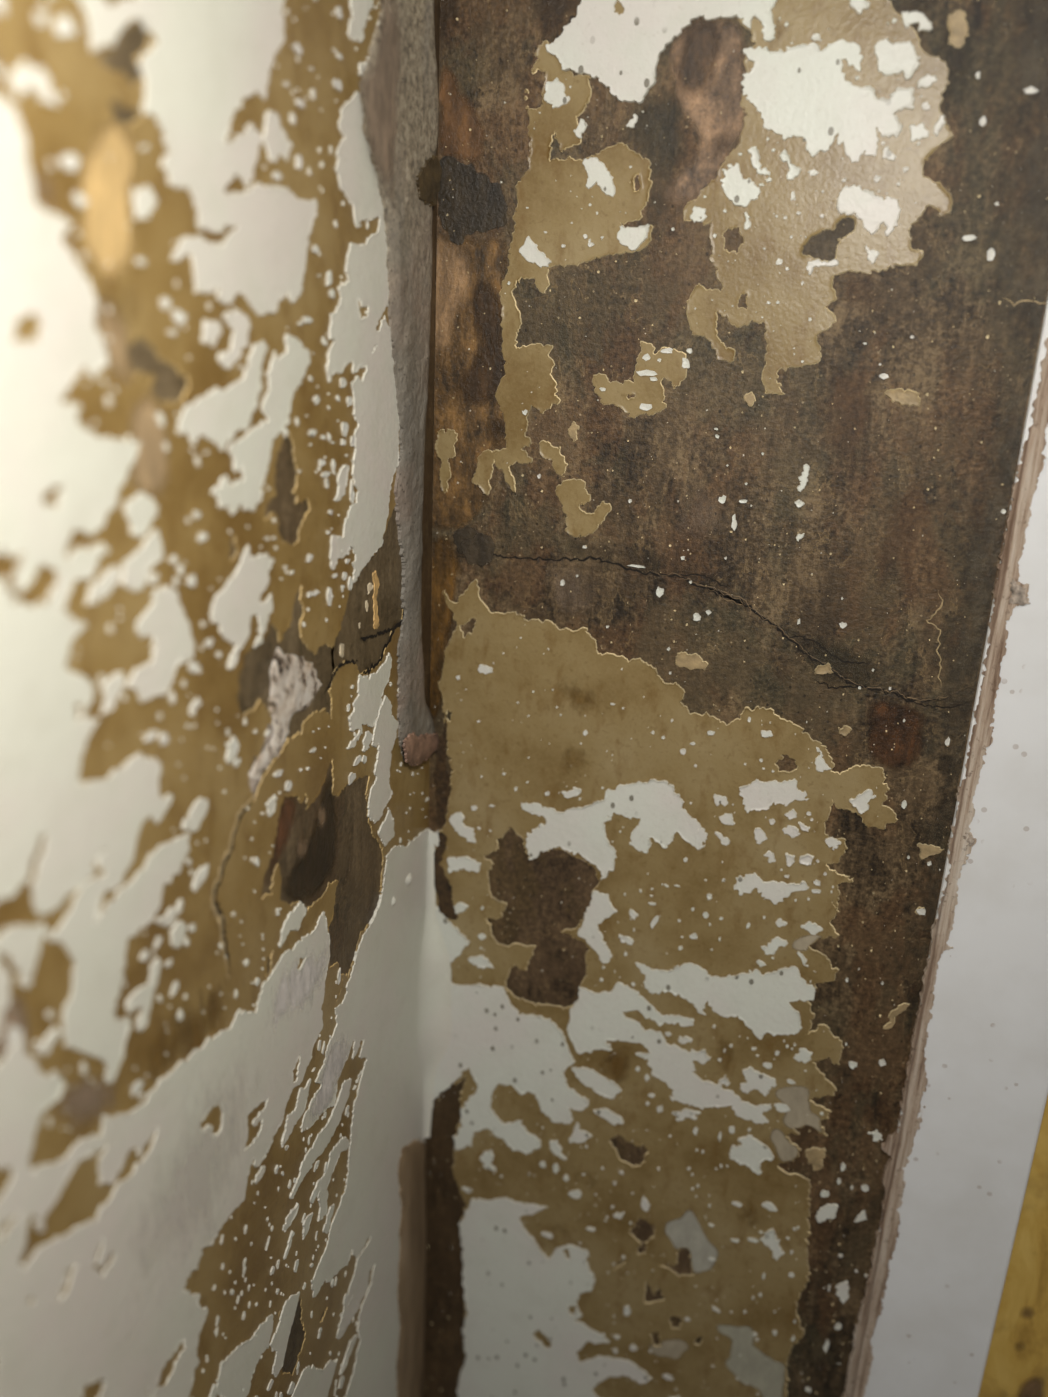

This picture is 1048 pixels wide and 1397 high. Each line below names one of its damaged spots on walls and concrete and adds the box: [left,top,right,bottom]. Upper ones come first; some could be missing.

damp [437,156,507,245]
damp [630,100,679,168]
damp [679,24,717,90]
peeling [472,0,953,538]
flaking render [415,138,458,711]
peeling [0,0,430,1397]
crack [324,610,404,694]
crack [441,554,974,708]
damp [811,643,867,681]
crack [211,794,255,978]
peeling [835,338,1048,1397]
peeling [416,579,898,1397]